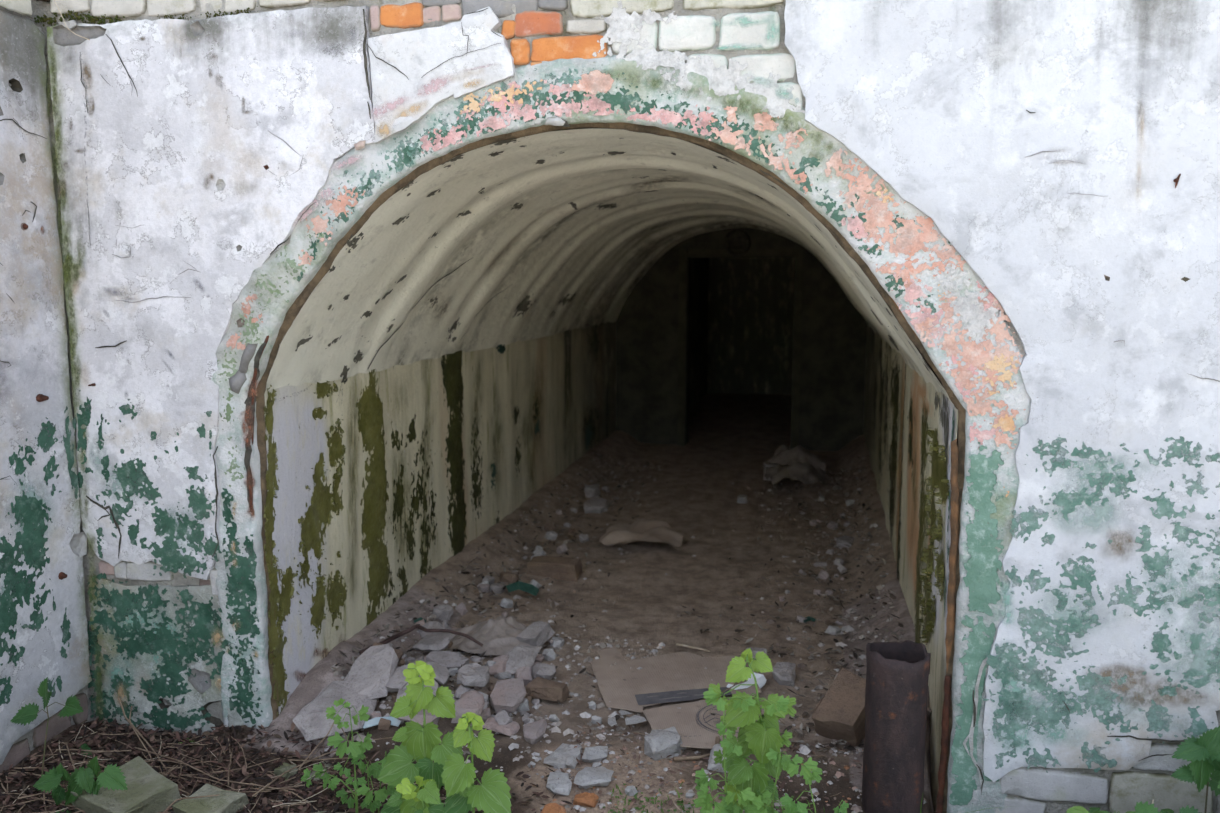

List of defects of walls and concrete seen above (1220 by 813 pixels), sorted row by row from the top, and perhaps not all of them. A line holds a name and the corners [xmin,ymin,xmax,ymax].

crack [363,8,501,119]
rust [242,383,257,445]
peeling [0,294,499,773]
peeling [297,0,1220,813]